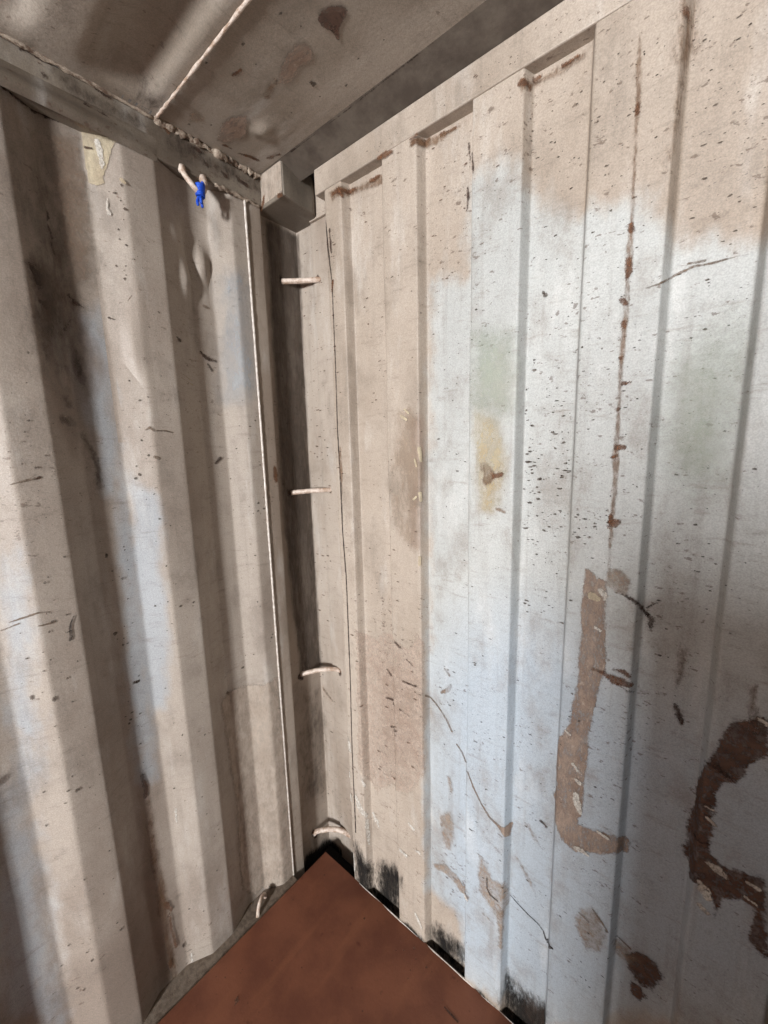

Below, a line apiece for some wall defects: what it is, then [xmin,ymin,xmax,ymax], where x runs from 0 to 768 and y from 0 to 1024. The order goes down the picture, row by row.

corrosion [509,54,583,142]
corrosion [603,38,666,130]
corrosion [330,175,382,197]
corrosion [366,126,482,173]
corrosion [523,158,667,630]
peeling [529,569,630,857]
water stain [304,840,402,912]
peeling [478,860,508,948]
peeling [682,716,768,958]
water stain [405,923,465,977]